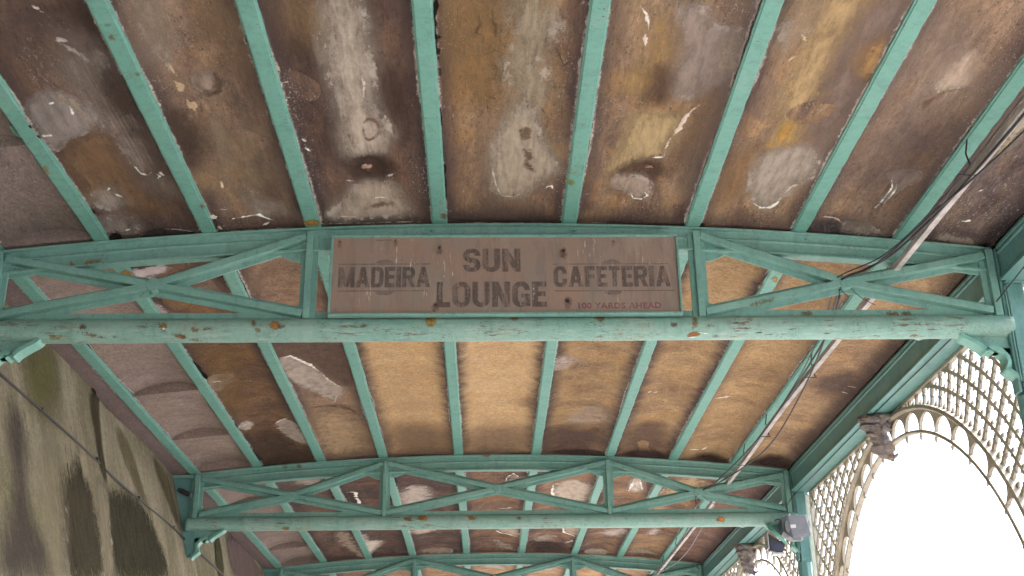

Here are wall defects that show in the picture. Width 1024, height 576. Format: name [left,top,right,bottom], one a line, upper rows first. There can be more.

damp [56,9,194,237]
damp [137,1,230,165]
damp [294,0,420,224]
damp [450,0,565,198]
damp [611,4,742,204]
damp [722,0,909,208]
damp [923,53,974,109]
damp [91,392,114,576]
damp [119,431,149,509]
damp [154,460,179,525]